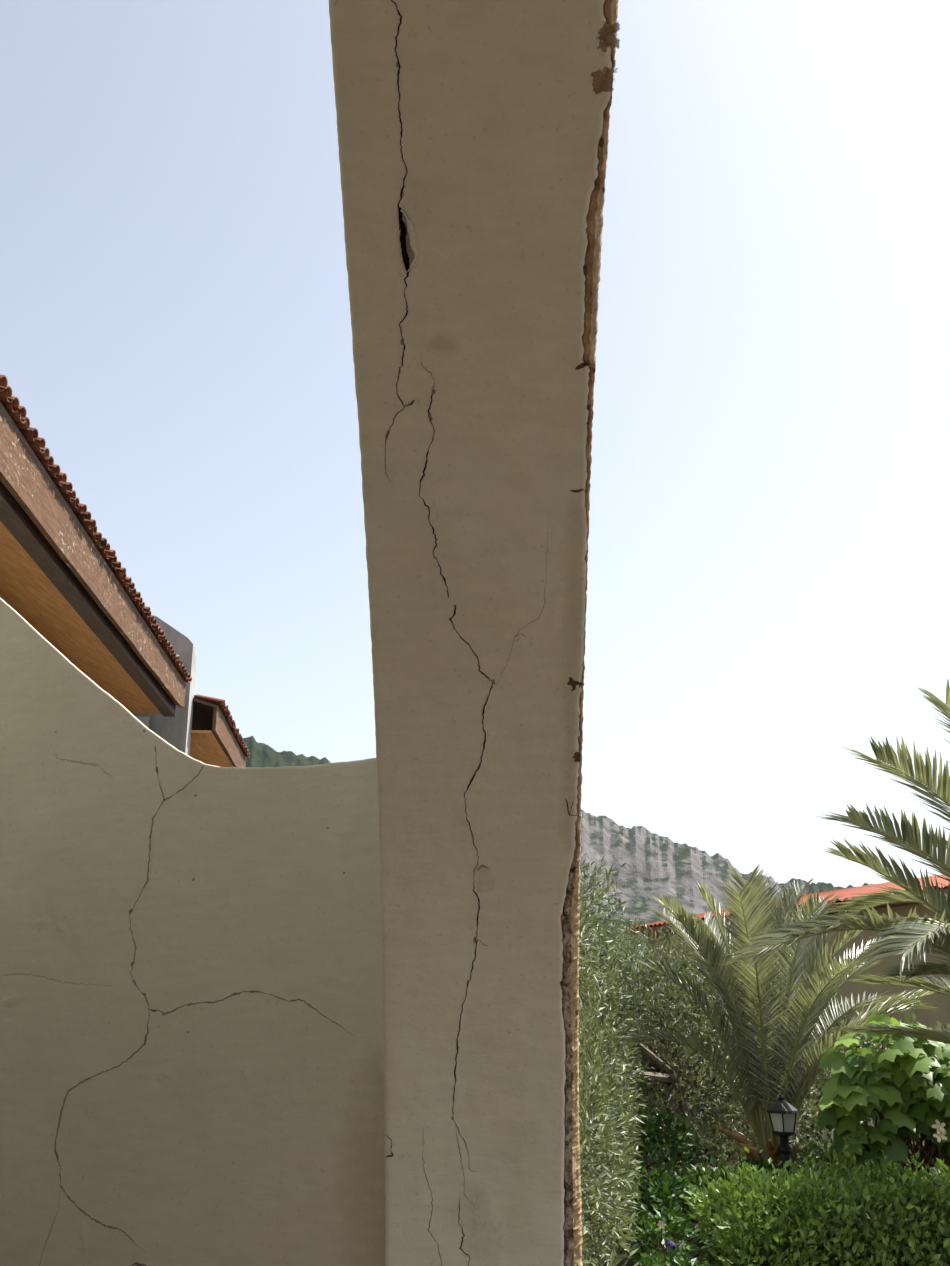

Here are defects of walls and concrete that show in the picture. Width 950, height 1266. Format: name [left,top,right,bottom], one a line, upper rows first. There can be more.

crack [54,744,354,1266]
crack [385,0,548,1266]
spalling [560,0,620,1266]